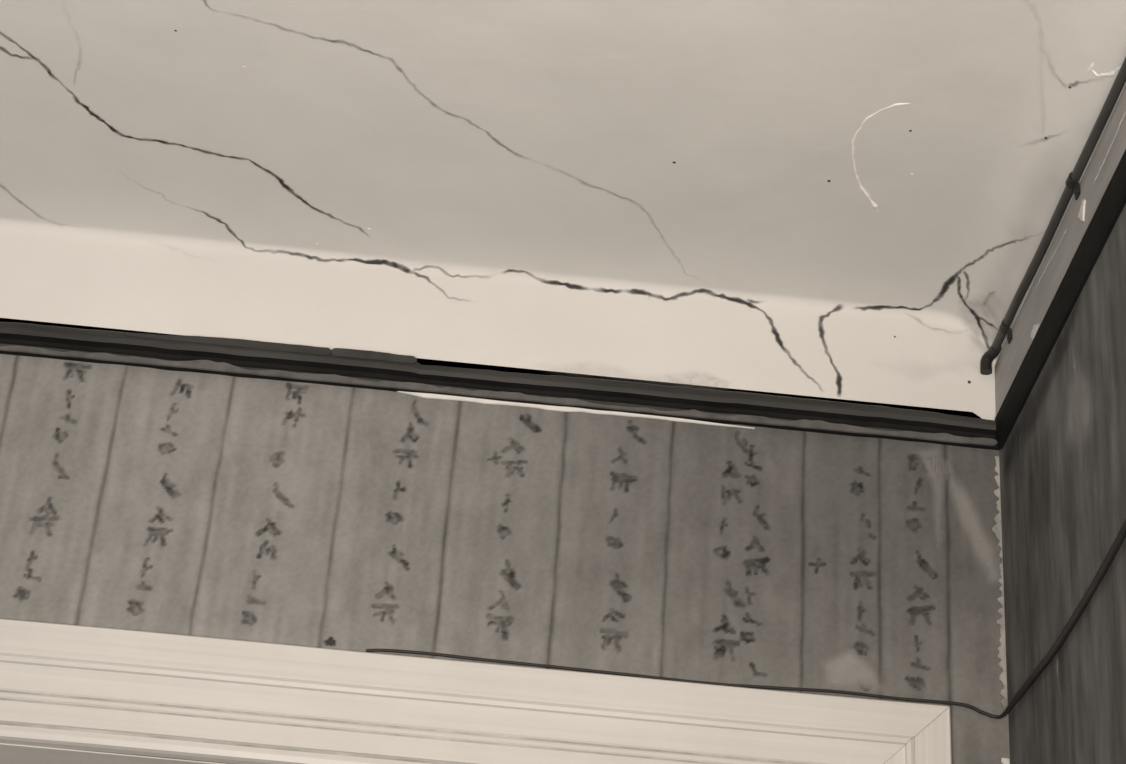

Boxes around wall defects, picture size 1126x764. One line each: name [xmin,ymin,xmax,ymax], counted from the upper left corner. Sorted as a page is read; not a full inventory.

crack [0,40,334,218]
crack [205,213,244,245]
crack [288,252,429,280]
crack [506,270,796,364]
crack [819,242,1012,394]